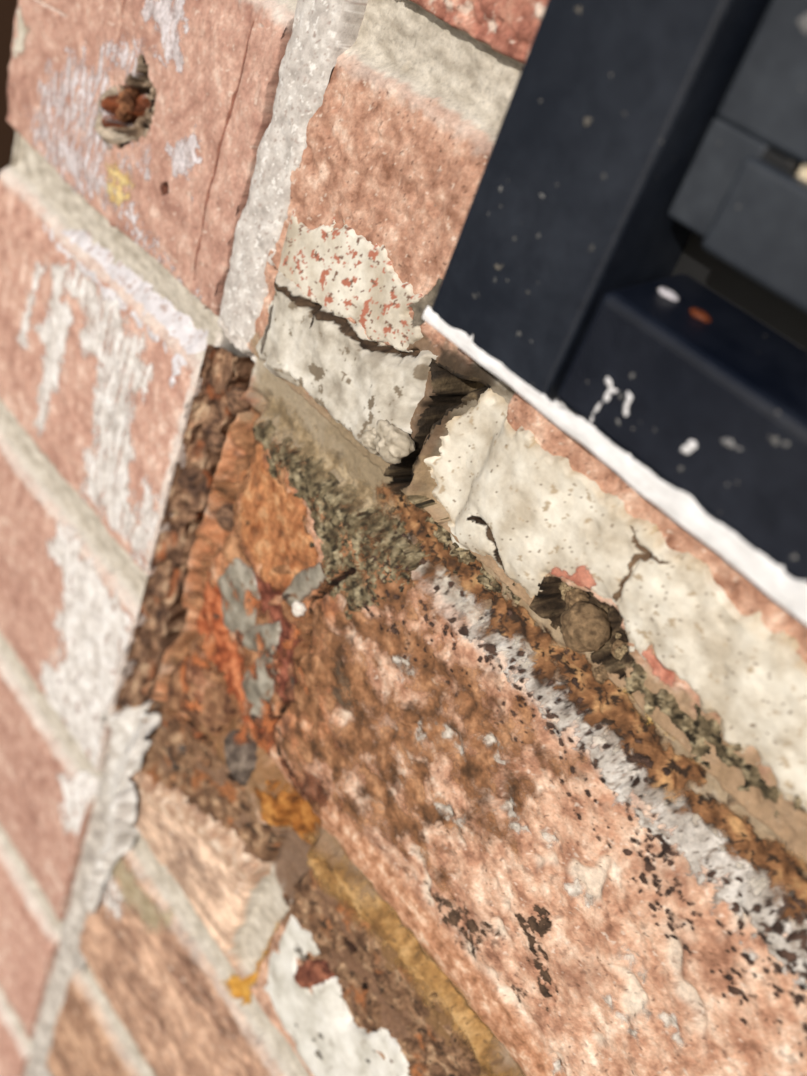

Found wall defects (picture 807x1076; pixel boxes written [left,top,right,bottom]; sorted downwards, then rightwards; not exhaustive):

spalling [94,54,156,150]
crack [269,263,420,358]
peeling [256,210,807,820]
rust [114,345,335,844]
rust [376,484,807,925]
spalling [134,699,294,885]
spalling [504,800,558,842]
spalling [564,879,593,908]
rust [223,917,284,1005]
rust [294,959,336,989]
spalling [262,856,488,1076]
spalling [642,1004,683,1045]